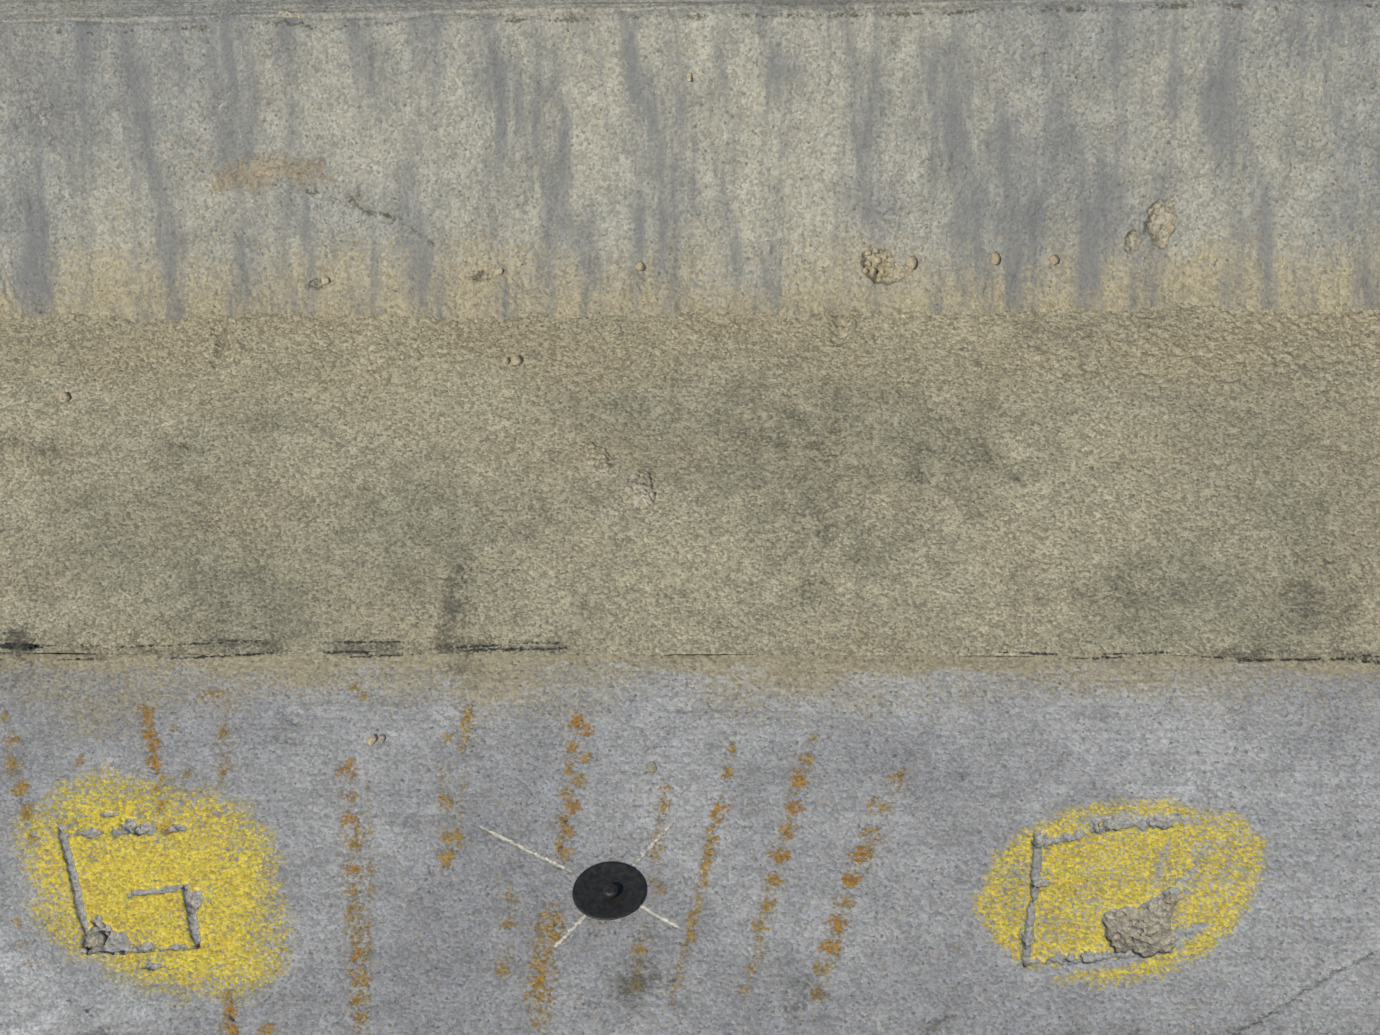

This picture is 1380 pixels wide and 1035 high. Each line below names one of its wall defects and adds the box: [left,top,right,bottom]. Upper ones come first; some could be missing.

spalling [80,914,161,970]
peeling [121,818,148,836]
peeling [188,890,204,913]
rust [334,758,374,1034]
rust [524,904,566,1026]
rust [555,712,595,863]
rust [681,799,730,952]
rust [740,733,820,993]
rust [810,797,892,999]
peeling [1020,931,1035,949]
spalling [1102,887,1182,958]
peeling [1149,816,1172,830]